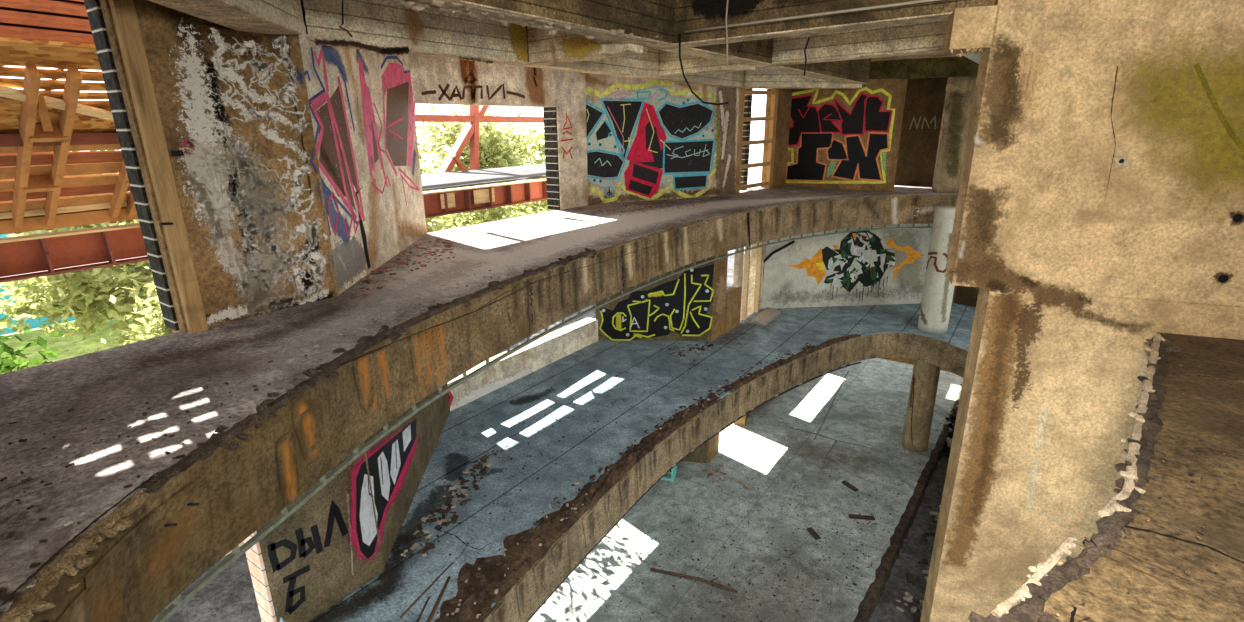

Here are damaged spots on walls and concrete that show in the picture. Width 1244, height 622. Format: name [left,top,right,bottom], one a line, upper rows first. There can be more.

leakage [169,10,334,325]
leakage [690,0,807,20]
leakage [756,200,836,243]
leakage [860,196,936,224]
leakage [948,40,1054,152]
spalling [0,235,596,622]
leakage [942,185,1146,566]
spalling [968,333,1182,622]